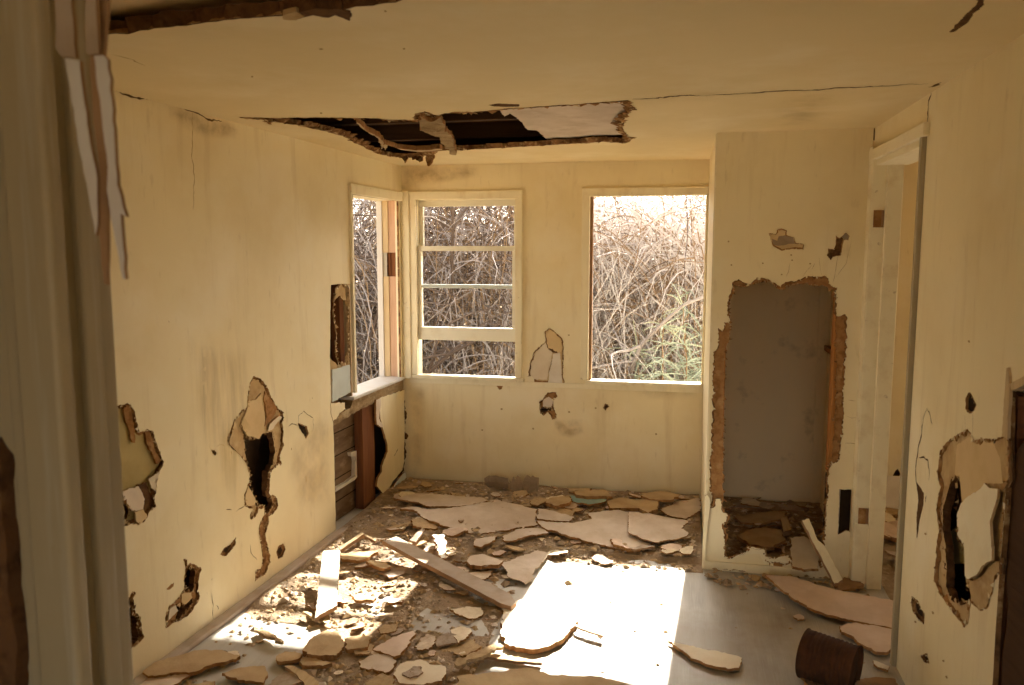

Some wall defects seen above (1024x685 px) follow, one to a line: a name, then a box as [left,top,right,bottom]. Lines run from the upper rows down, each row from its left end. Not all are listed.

crack [645,82,942,120]
crack [185,109,222,206]
spalling [769,228,804,261]
hole [827,233,850,260]
peeling [528,328,570,420]
hole [965,392,976,413]
spalling [118,403,164,526]
hole [226,376,314,581]
spalling [220,537,237,556]
peeling [725,546,788,564]
spalling [916,429,1015,628]
spalling [165,559,201,628]